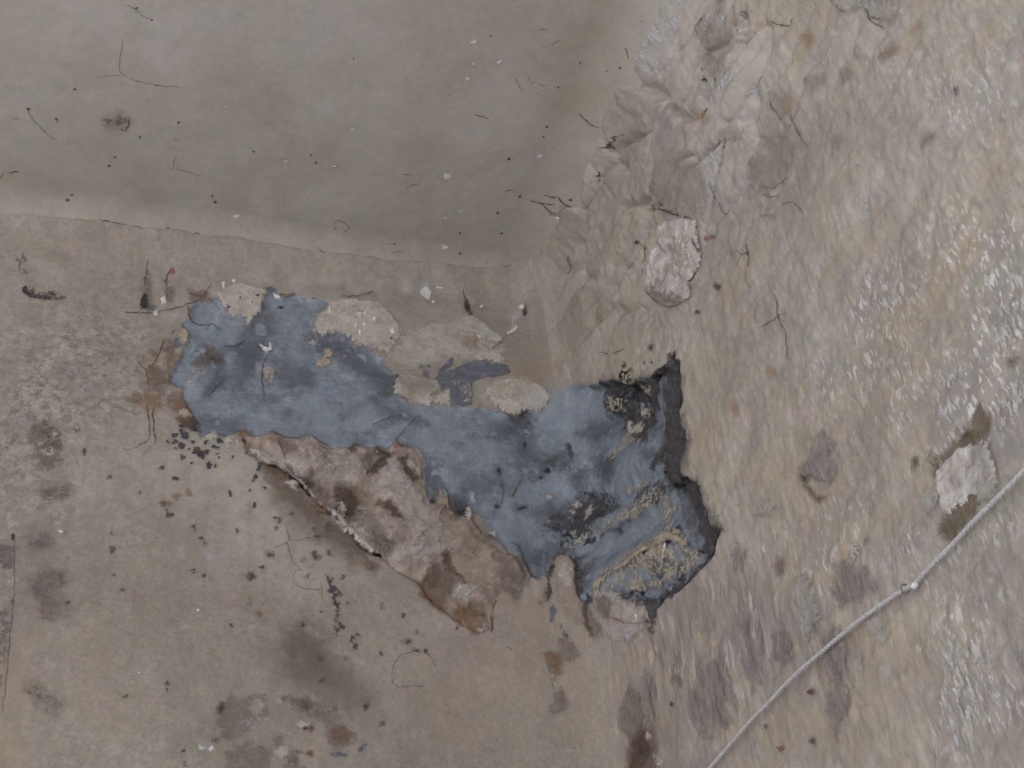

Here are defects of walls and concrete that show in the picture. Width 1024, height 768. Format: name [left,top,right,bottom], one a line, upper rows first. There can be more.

flaking render [166,286,723,643]